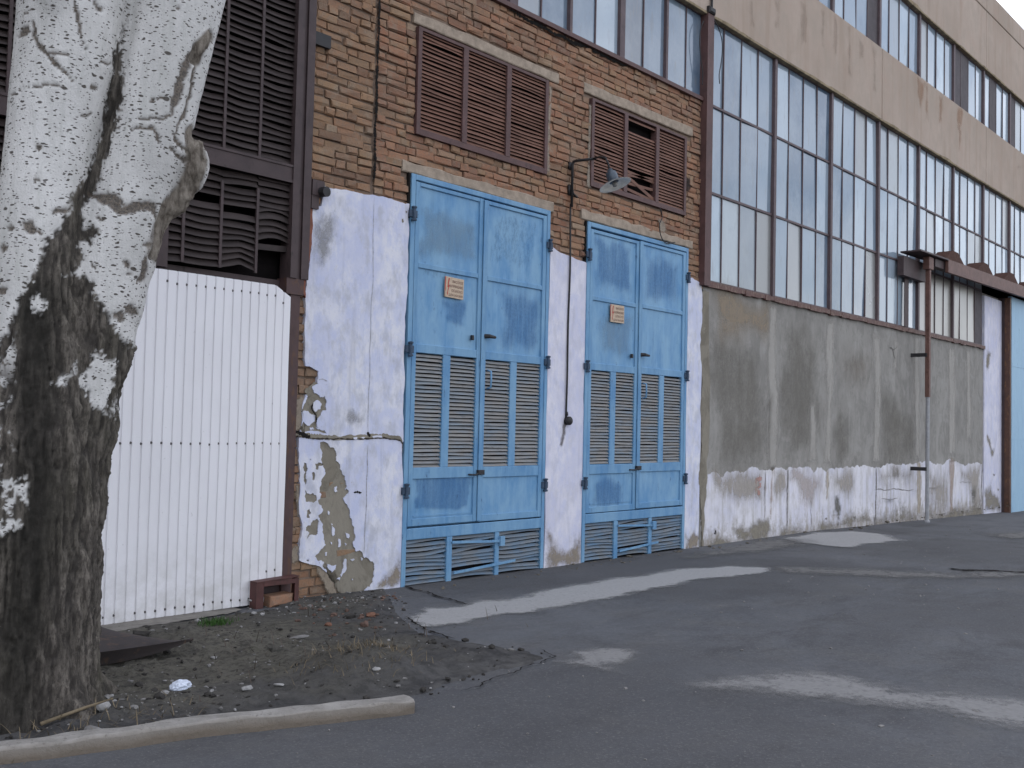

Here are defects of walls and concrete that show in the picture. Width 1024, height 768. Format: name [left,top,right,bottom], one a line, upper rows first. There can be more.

water stain [719,293,834,467]
water stain [873,338,919,461]
water stain [949,348,971,453]
peeling [292,382,374,594]
peeling [775,470,818,499]
peeling [837,472,853,492]
peeling [966,470,1000,510]